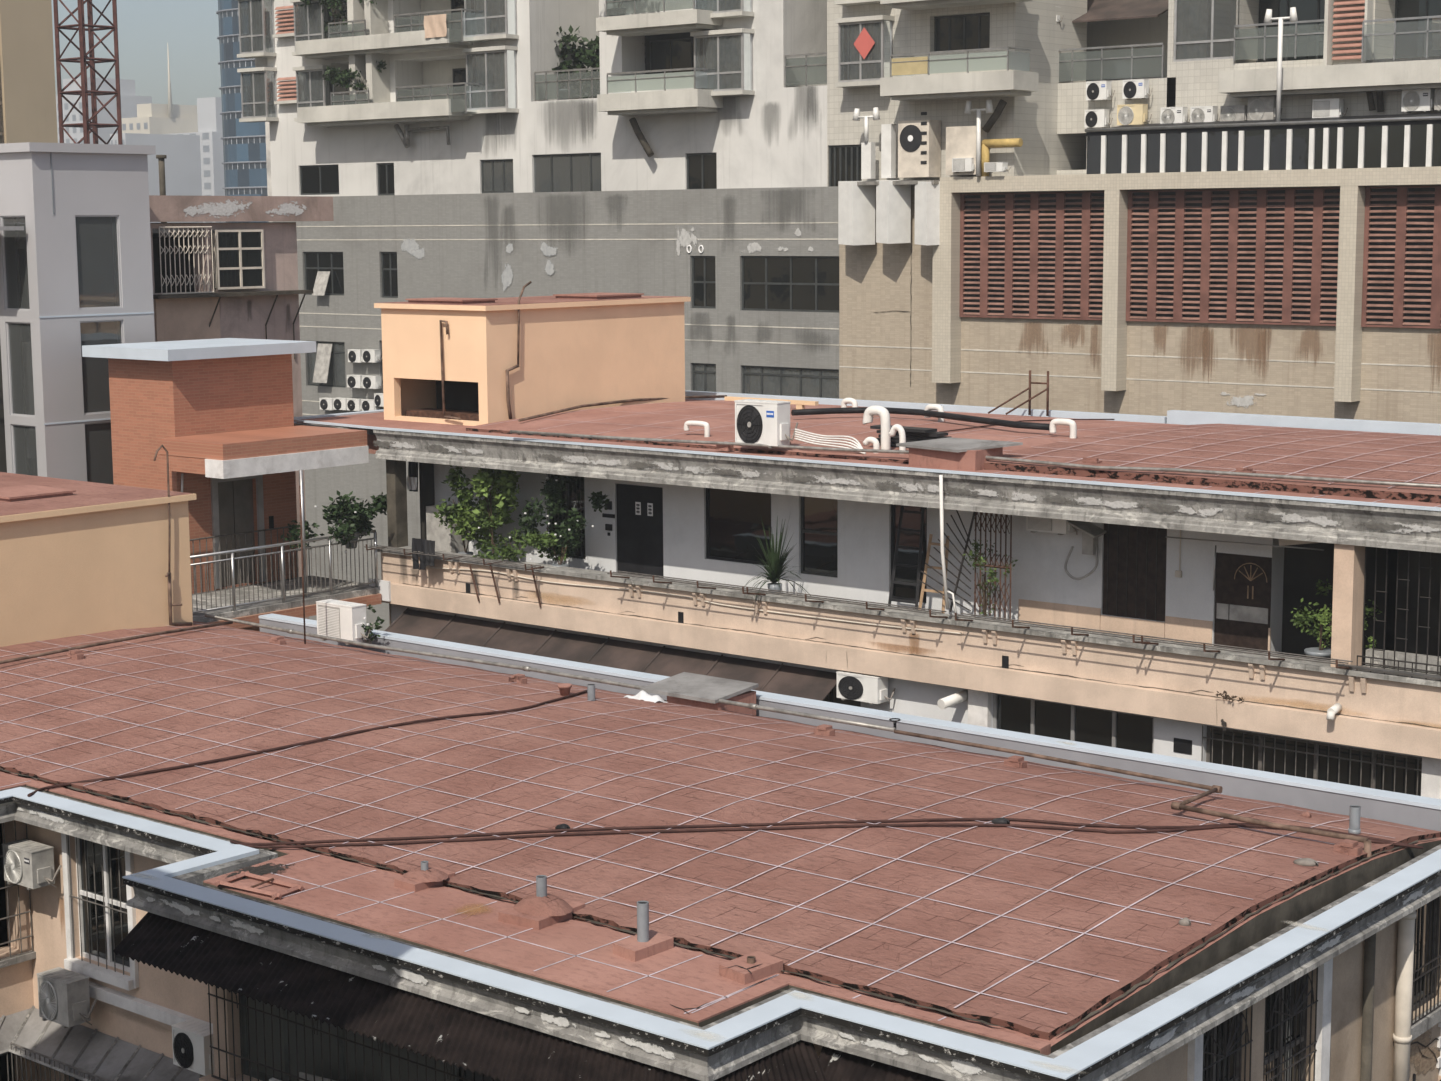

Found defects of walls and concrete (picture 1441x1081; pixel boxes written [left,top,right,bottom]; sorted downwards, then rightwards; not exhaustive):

spalling [466,428,1223,517]
spalling [984,462,1441,504]
crack [0,768,405,874]
spalling [0,766,409,875]
crack [443,883,519,903]
crack [572,916,637,934]
spalling [783,832,1441,1040]
peeling [372,965,428,986]
crack [674,942,1005,1027]
peeling [515,1007,576,1028]
peeling [595,1031,675,1060]
peeling [839,1032,986,1075]